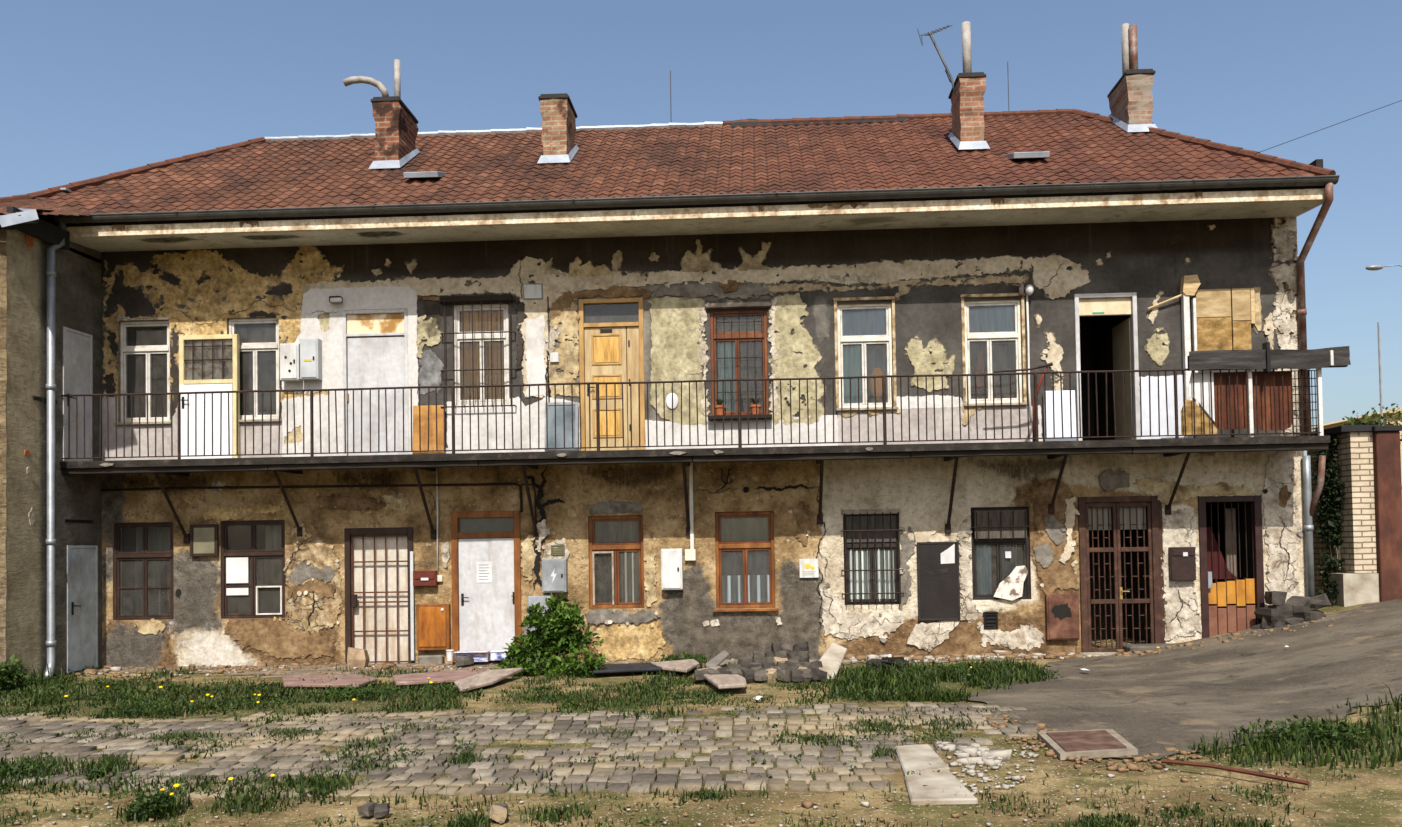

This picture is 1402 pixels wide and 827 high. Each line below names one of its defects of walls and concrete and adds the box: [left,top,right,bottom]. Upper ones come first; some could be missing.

peeling [102,239,1112,421]
spalling [1144,290,1170,368]
spalling [1252,217,1299,349]
spalling [962,401,981,425]
spalling [182,480,343,661]
spalling [819,515,1076,656]
spalling [1030,478,1080,594]